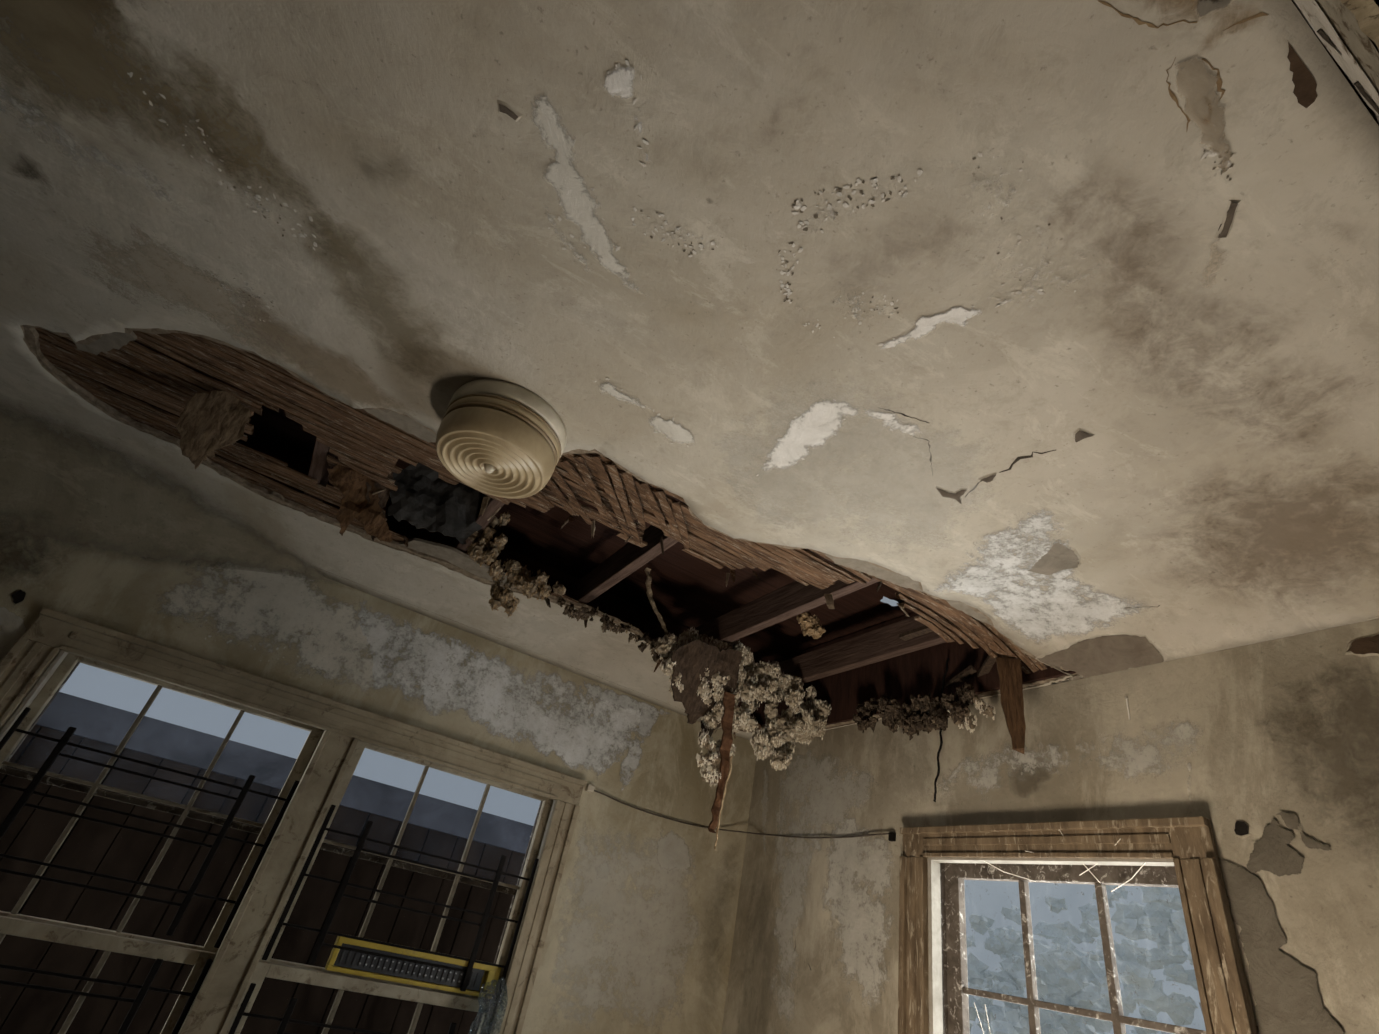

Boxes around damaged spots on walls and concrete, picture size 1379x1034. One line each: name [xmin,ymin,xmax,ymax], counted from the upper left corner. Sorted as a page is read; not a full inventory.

damp [0,0,309,202]
peeling [604,60,649,168]
peeling [497,96,637,290]
peeling [878,223,1076,348]
peeling [595,378,695,447]
peeling [757,400,919,476]
crack [881,408,1095,504]
peeling [158,563,667,790]
peeling [934,511,1165,686]
damp [1277,669,1379,826]
flaking render [1346,633,1379,657]
peeling [1218,811,1344,1034]